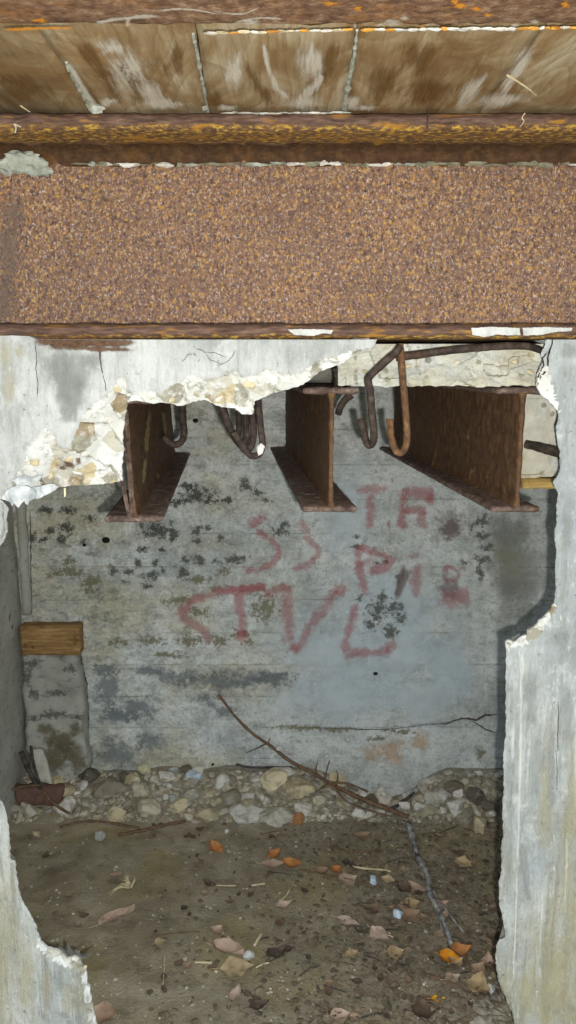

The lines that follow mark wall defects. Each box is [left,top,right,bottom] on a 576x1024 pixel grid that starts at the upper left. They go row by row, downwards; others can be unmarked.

spalling [1,327,572,508]
rust [121,411,167,520]
damp [170,478,273,508]
damp [29,505,252,618]
spalling [504,603,557,651]
crack [305,714,498,733]
spalling [36,937,97,1024]